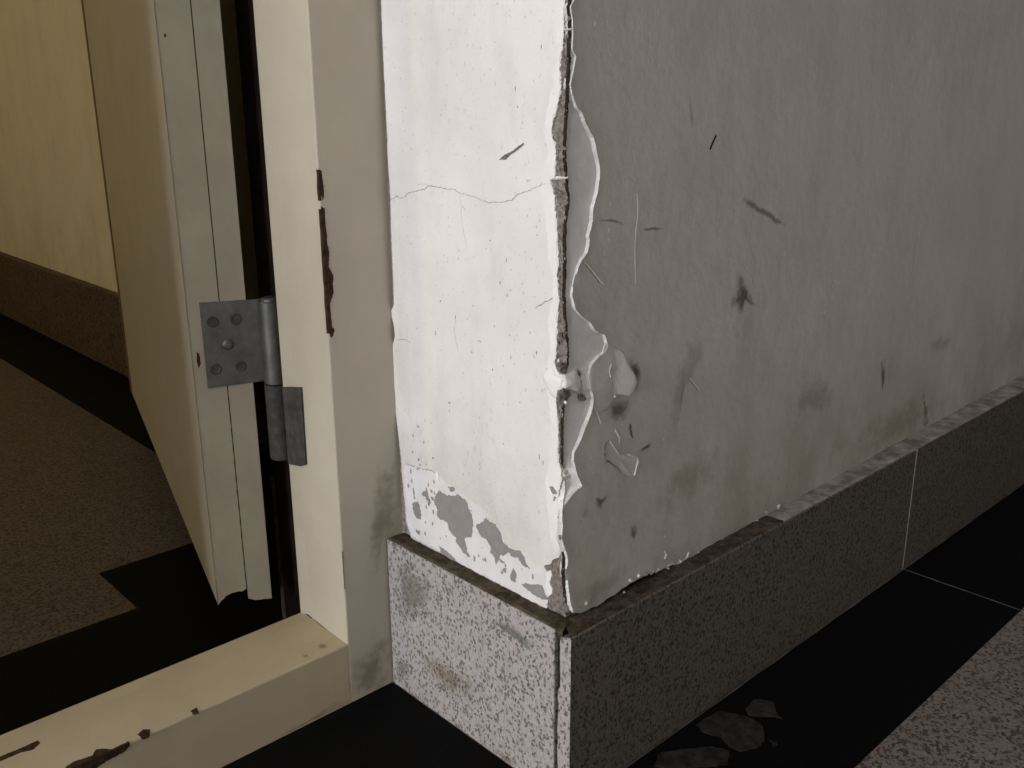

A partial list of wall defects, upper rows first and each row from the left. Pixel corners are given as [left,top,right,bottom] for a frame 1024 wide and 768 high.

crack [390,183,551,245]
spalling [316,169,335,338]
spalling [404,0,608,612]
peeling [604,430,638,476]
spalling [623,551,700,593]
spalling [0,740,40,761]
spalling [66,729,151,768]